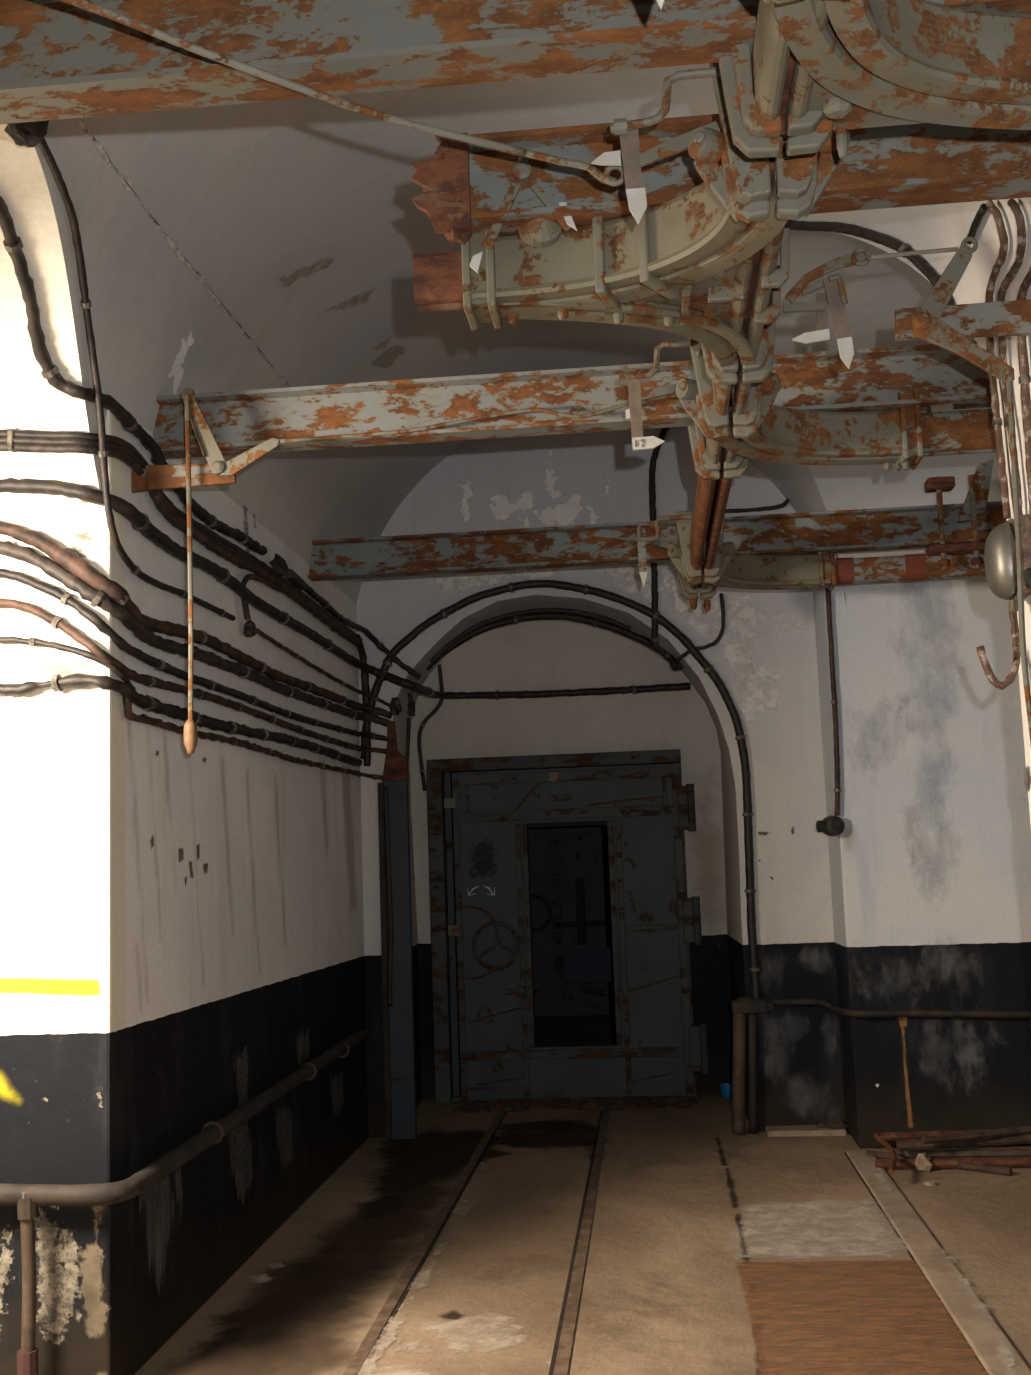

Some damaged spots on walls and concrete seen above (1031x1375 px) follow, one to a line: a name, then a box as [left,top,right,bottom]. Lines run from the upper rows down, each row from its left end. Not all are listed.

peeling [458,449,611,530]
peeling [0,1231,15,1330]
peeling [34,1206,109,1344]
water stain [164,1120,606,1375]